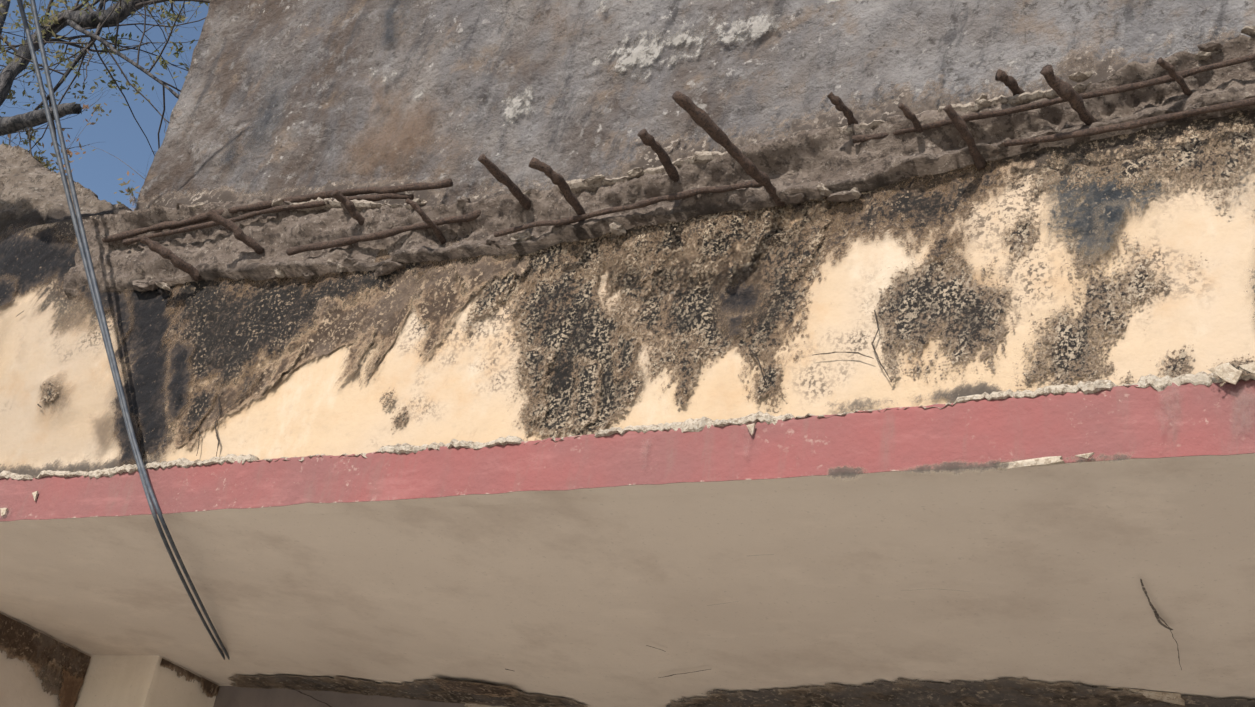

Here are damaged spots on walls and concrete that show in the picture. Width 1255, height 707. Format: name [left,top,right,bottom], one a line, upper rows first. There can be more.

damp [0,110,1255,478]
spalling [63,26,1255,452]
spalling [666,677,1255,707]
crack [1140,579,1182,670]